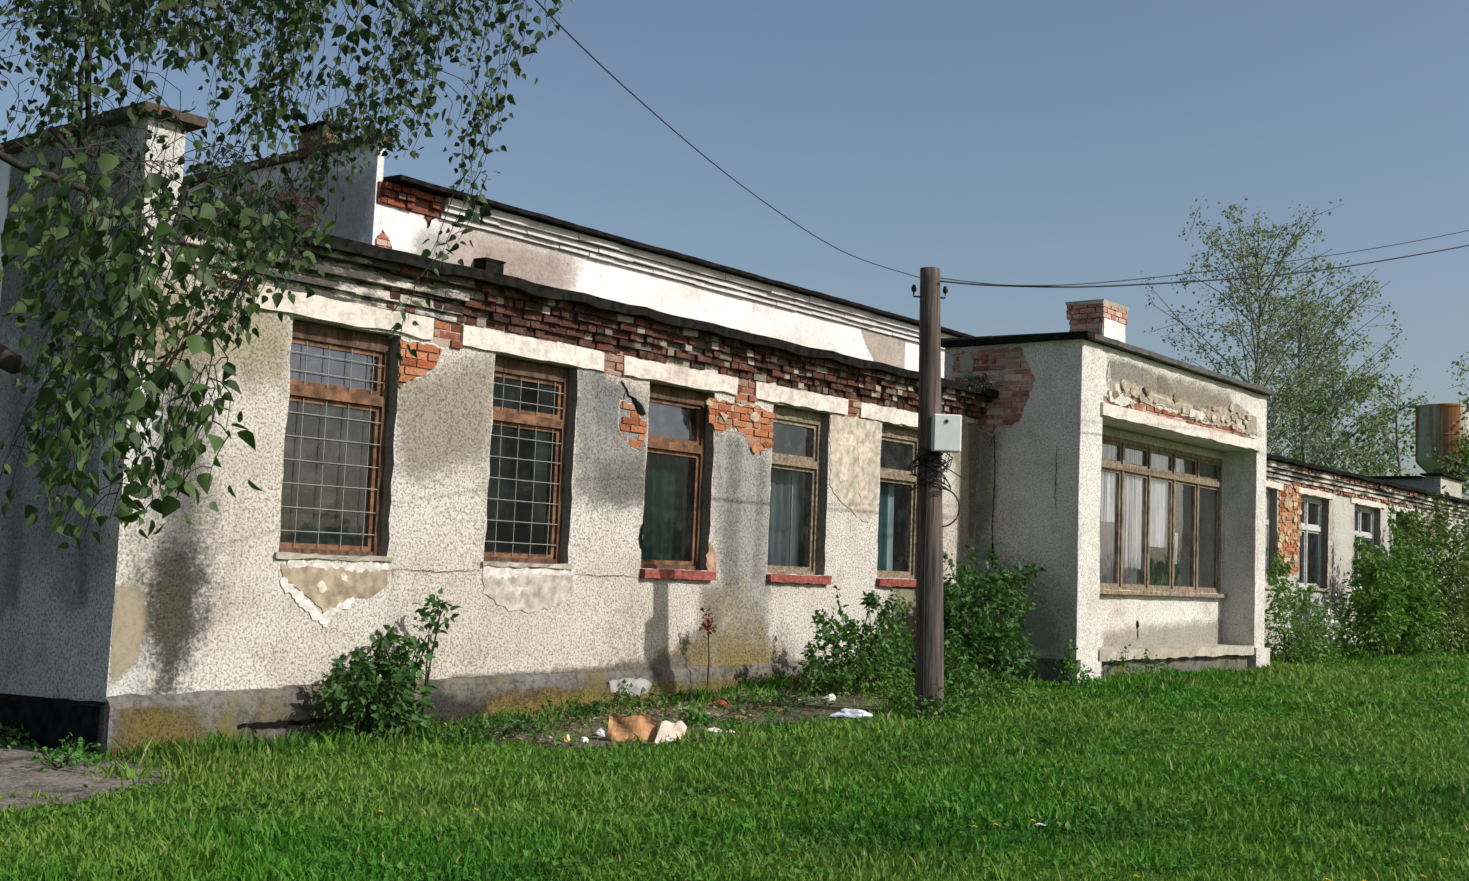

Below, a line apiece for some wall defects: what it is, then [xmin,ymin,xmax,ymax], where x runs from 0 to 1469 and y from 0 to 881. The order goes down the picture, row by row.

flaking render [379,203,443,223]
flaking render [397,318,463,390]
flaking render [618,397,647,452]
flaking render [705,378,774,459]
flaking render [947,344,1037,435]
flaking render [1103,379,1257,451]
leakage [0,352,109,603]
leakage [136,353,211,691]
flaking render [1276,479,1316,577]
flaking render [280,559,389,628]
leakage [424,436,771,725]